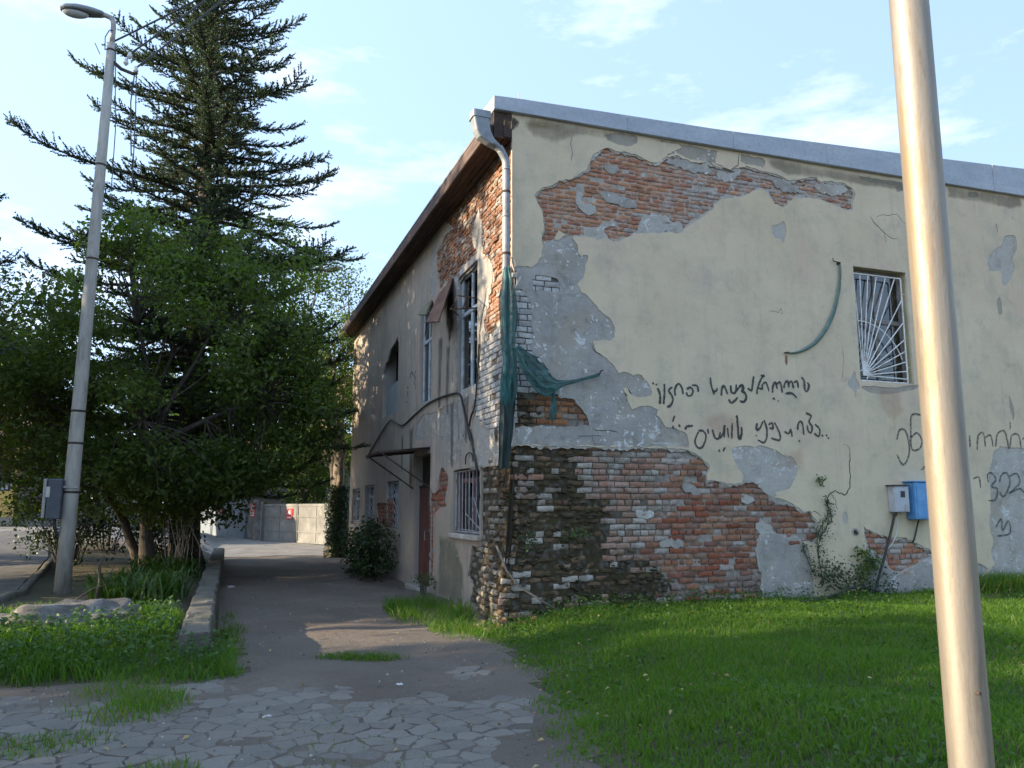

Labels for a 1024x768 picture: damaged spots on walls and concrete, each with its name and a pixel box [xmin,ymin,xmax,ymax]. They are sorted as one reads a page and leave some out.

peeling [988,235,1017,286]
spalling [416,133,903,624]
crack [813,444,851,571]
spalling [842,512,934,593]
peeling [978,446,1024,578]